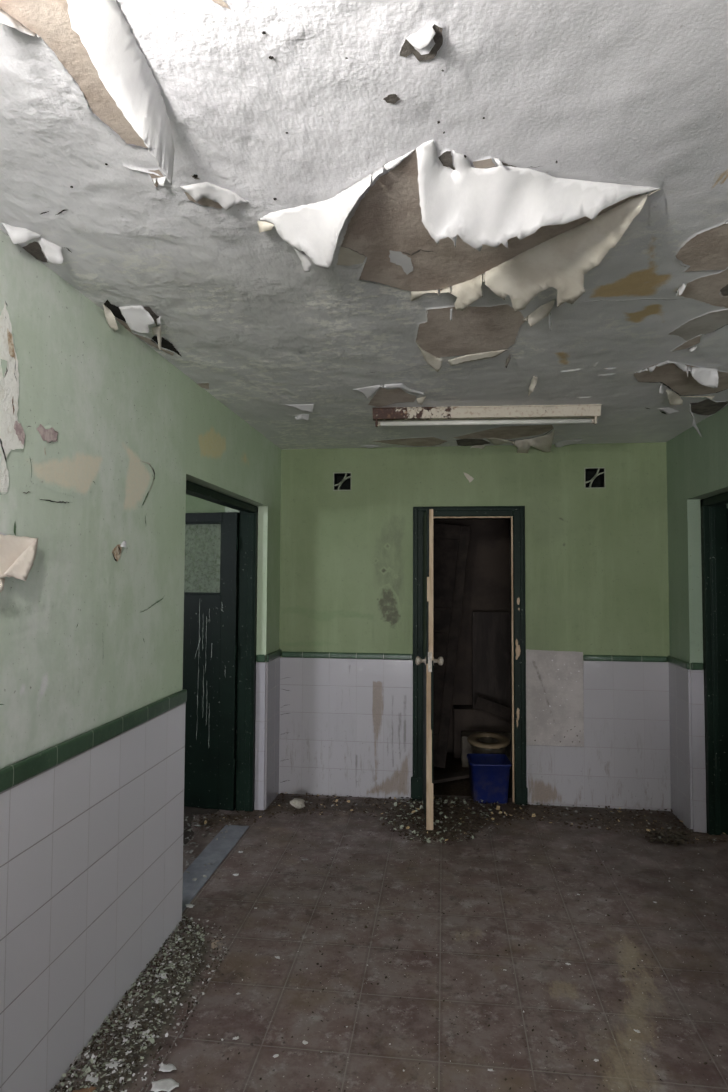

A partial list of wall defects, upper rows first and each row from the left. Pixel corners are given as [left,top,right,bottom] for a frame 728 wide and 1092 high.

peeling [398,18,448,63]
peeling [0,0,249,211]
flaking render [383,94,400,104]
peeling [1,222,71,264]
peeling [257,121,660,372]
peeling [103,300,182,357]
peeling [633,221,728,437]
peeling [0,301,59,496]
peeling [119,435,155,523]